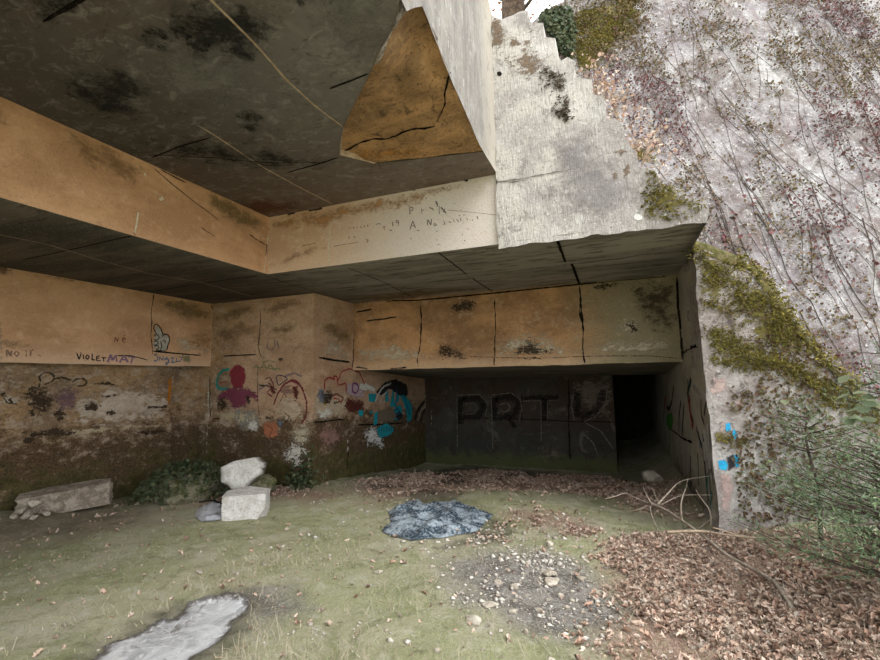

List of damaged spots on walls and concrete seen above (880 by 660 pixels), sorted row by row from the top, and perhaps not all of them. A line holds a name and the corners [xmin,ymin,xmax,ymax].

damp [142,0,273,60]
damp [66,70,140,120]
crack [345,72,451,151]
spalling [340,0,483,164]
crack [155,155,317,237]
crack [390,305,422,369]
damp [437,343,468,360]
damp [499,333,564,360]
crack [470,286,700,363]
peeling [0,382,168,444]